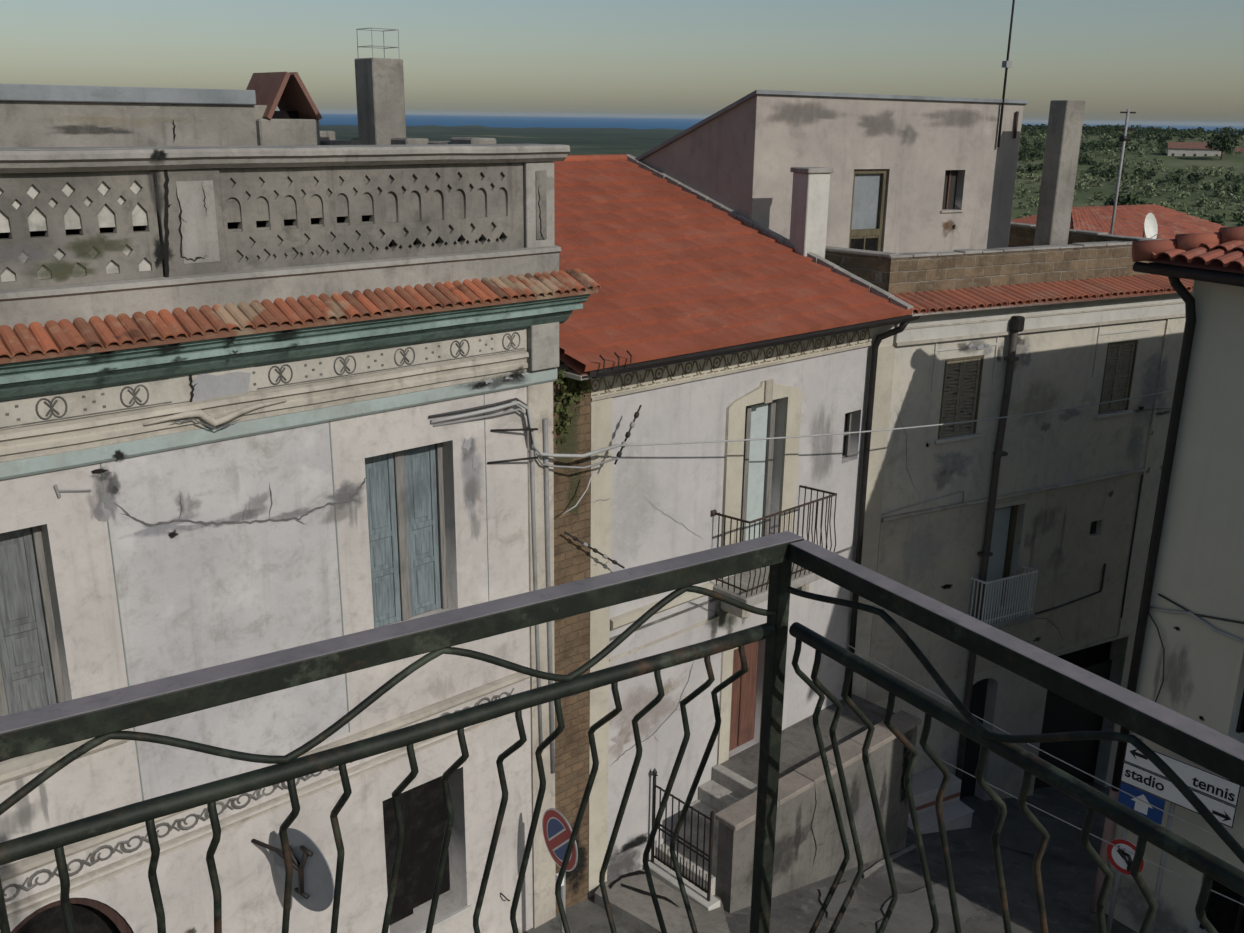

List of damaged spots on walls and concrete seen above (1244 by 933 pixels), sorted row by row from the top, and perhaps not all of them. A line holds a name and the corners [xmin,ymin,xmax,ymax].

crack [150,170,209,278]
spalling [91,469,119,522]
crack [116,476,367,527]